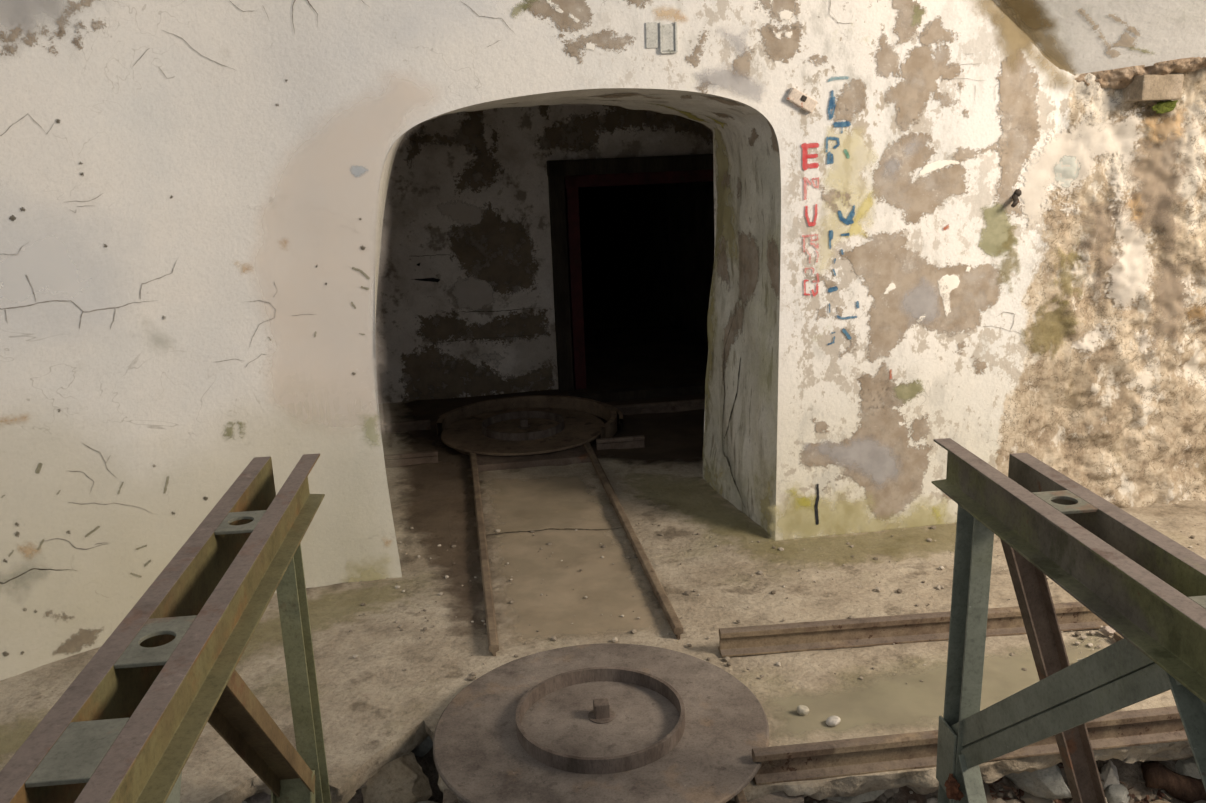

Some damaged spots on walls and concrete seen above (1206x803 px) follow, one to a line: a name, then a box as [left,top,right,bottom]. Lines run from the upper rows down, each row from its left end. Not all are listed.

crack [230,0,318,34]
peeling [524,0,829,156]
water stain [979,0,1074,85]
crack [0,241,176,329]
peeling [405,110,539,295]
peeling [399,309,557,402]
peeling [716,232,779,386]
peeling [799,0,1206,521]